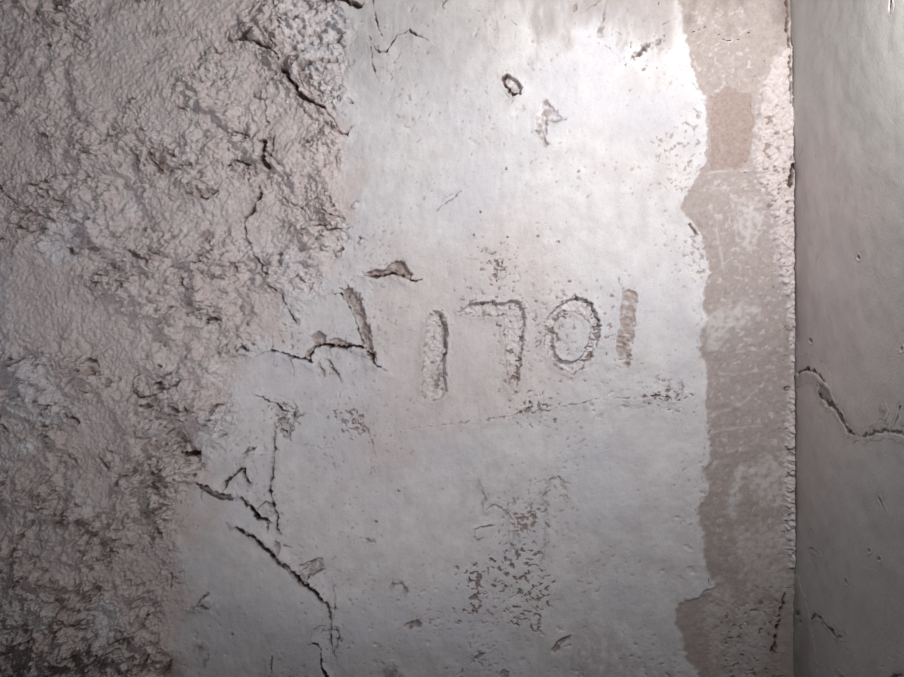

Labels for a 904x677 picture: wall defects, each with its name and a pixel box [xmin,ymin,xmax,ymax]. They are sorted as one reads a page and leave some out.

crack [182,0,462,677]
peeling [621,23,795,677]
crack [794,354,904,445]
crack [810,609,904,677]